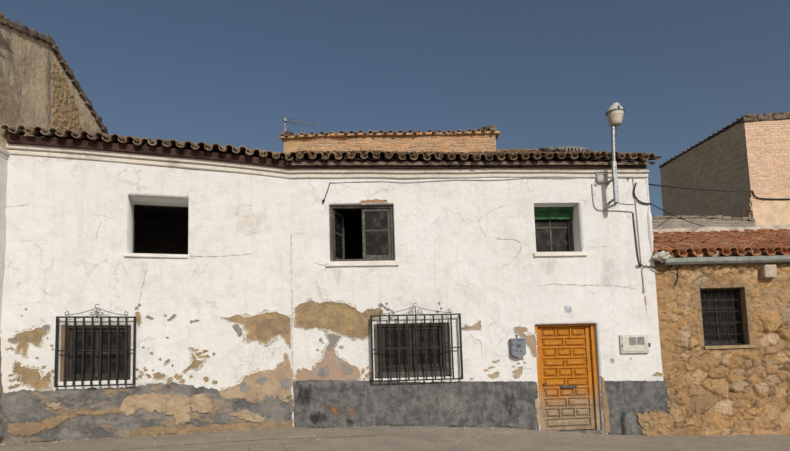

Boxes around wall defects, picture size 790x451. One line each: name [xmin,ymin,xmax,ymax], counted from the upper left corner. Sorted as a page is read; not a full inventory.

crack [475,205,527,269]
flaking render [0,298,397,443]
flaking render [484,360,500,380]
flaking render [511,325,538,379]